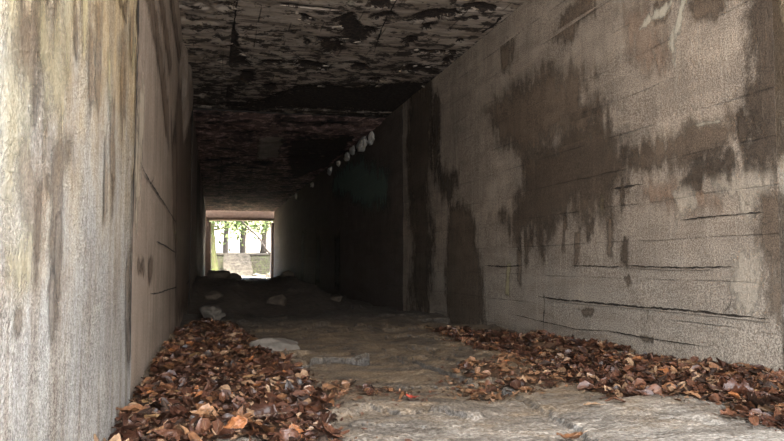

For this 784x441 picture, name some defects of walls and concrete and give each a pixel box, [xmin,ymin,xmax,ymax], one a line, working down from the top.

water stain [7,0,101,341]
water stain [104,0,139,224]
water stain [125,253,153,362]
crack [130,1,177,353]
water stain [149,0,206,327]
crack [233,0,345,28]
crack [374,0,397,52]
water stain [489,0,784,296]
crack [517,296,770,347]
crack [572,264,731,272]
crack [683,212,761,220]
water stain [757,191,784,368]